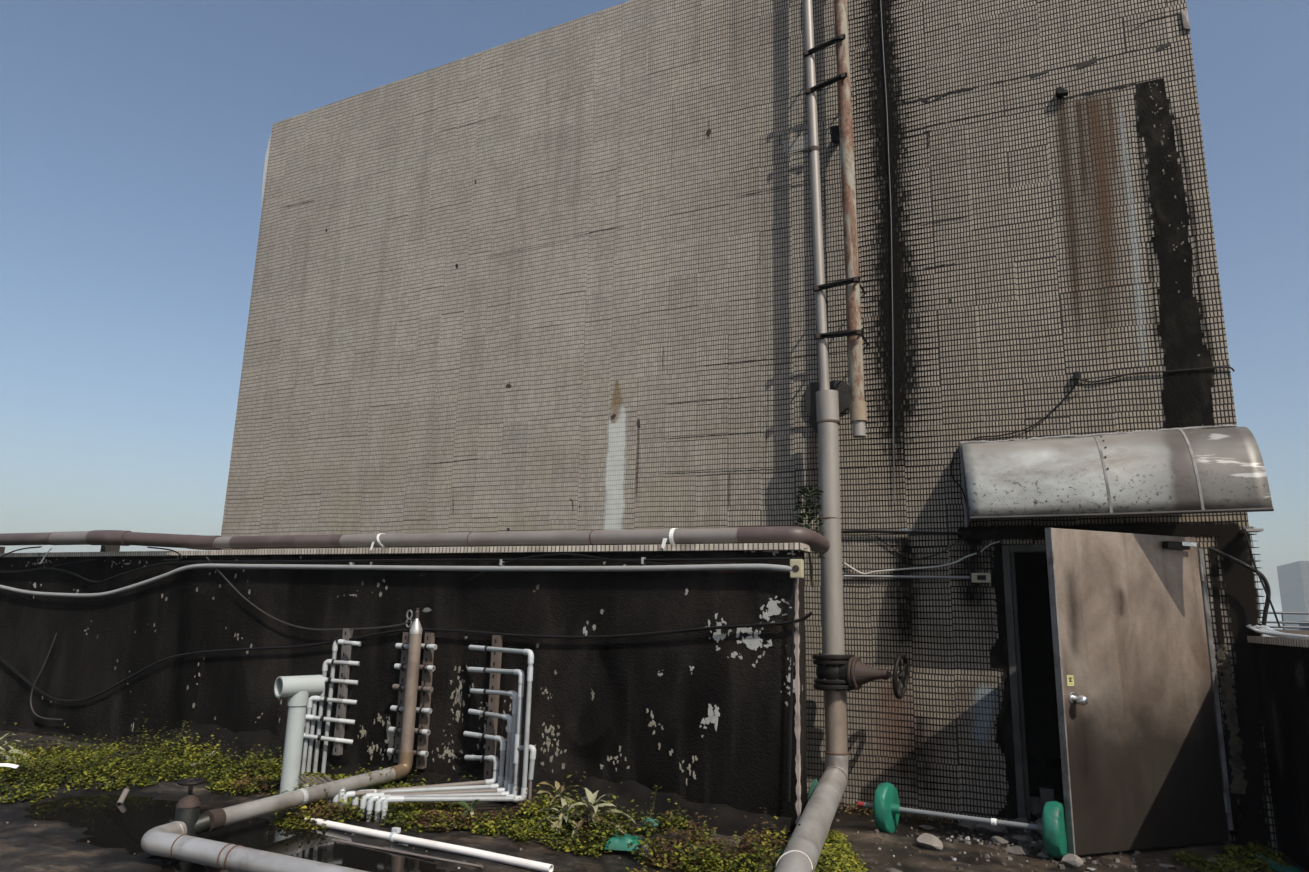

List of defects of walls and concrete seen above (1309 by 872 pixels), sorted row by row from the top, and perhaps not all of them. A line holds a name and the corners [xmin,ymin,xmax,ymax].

water stain [843,0,953,484]
corrosion [1059,102,1085,293]
water stain [1134,114,1160,348]
water stain [1172,112,1217,374]
peeling [646,708,698,785]
peeling [700,704,720,738]
peeling [706,596,795,695]
spalling [990,528,1018,819]